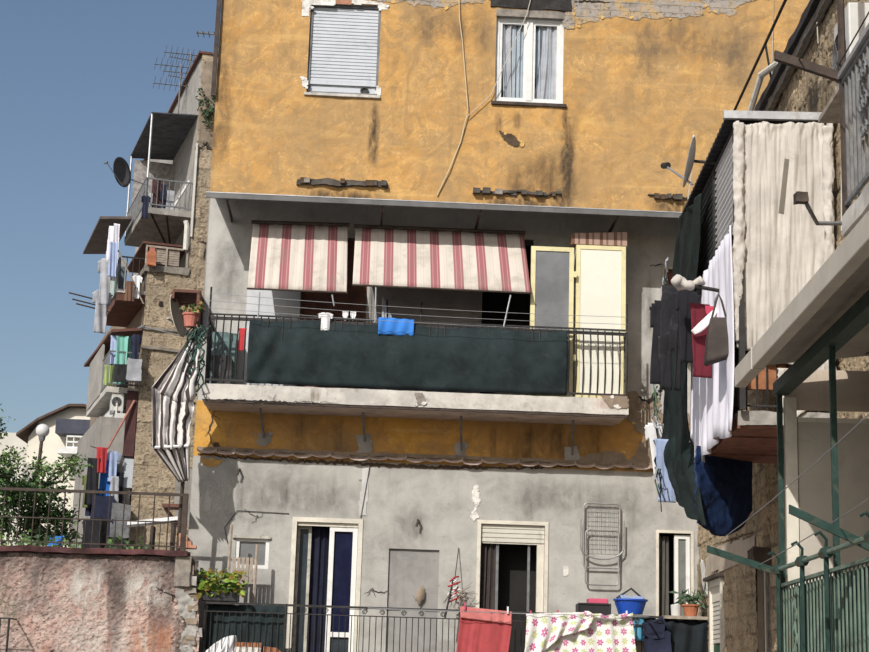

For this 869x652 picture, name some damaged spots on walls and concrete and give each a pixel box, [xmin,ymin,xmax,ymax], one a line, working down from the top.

flaking render [301,0,484,16]
flaking render [563,0,755,29]
flaking render [499,131,525,147]
flaking render [601,391,663,471]
flaking render [470,485,481,521]
water stain [72,575,100,606]
water stain [127,576,161,603]